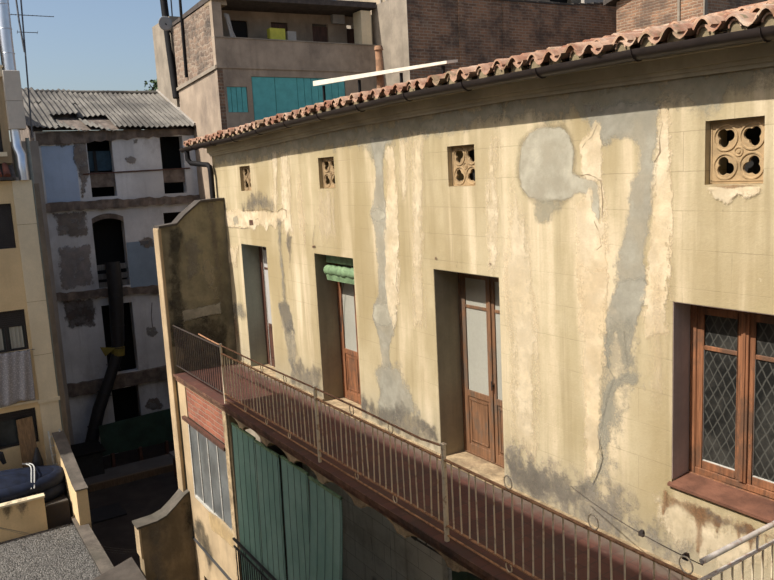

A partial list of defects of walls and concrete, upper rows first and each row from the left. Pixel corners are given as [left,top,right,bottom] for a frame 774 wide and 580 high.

flaking render [55,143,89,198]
flaking render [53,211,94,290]
flaking render [63,298,96,328]
damp [169,229,227,372]
damp [243,152,319,392]
damp [486,142,499,268]
damp [504,195,621,536]
crack [586,100,660,488]
damp [636,498,771,568]